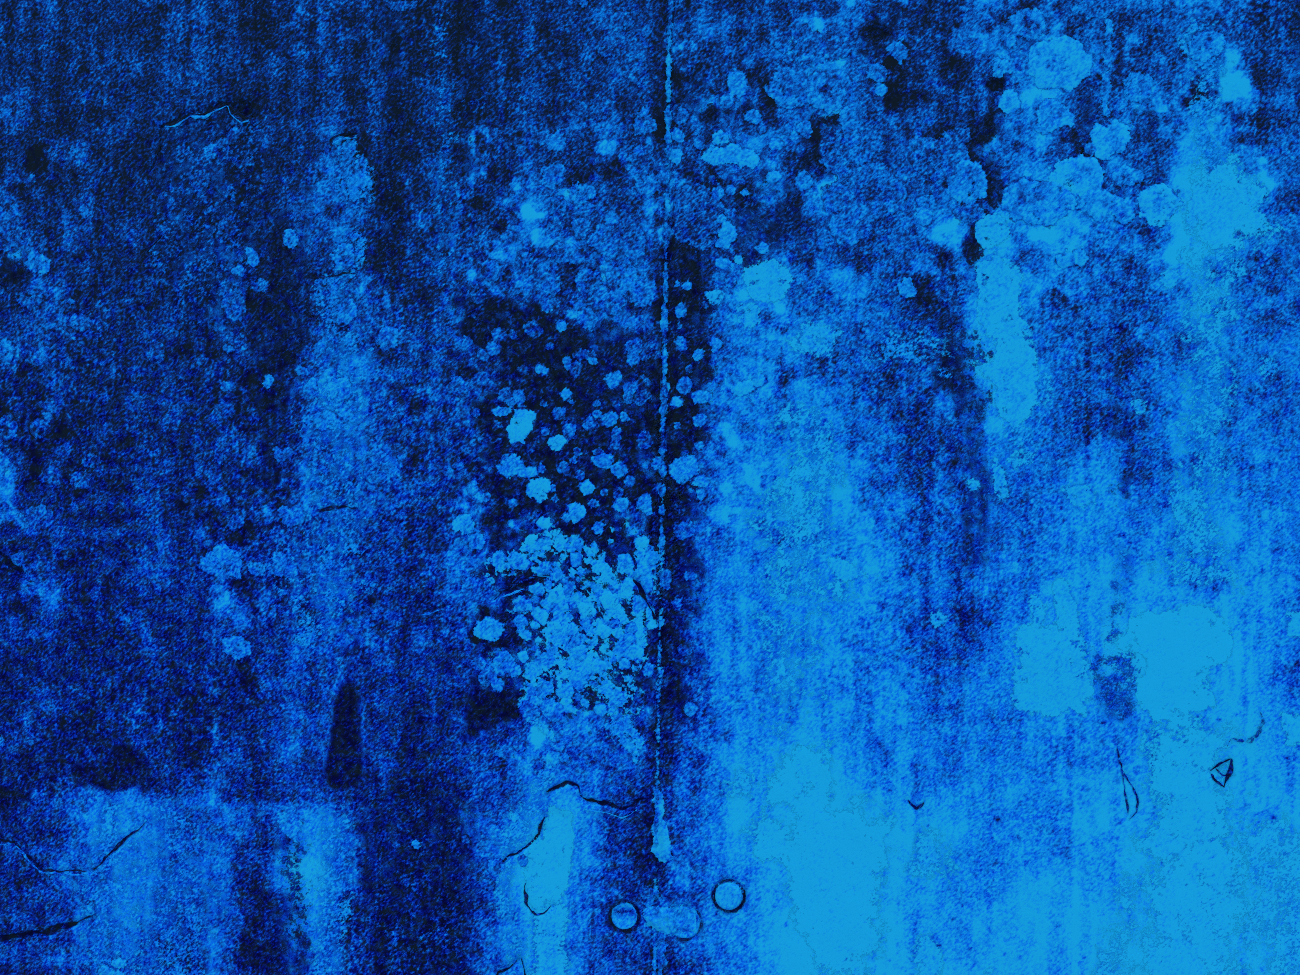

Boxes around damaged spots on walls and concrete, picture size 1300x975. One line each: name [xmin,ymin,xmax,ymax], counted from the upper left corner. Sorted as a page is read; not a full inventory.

crack [152,101,254,168]
water stain [809,113,841,128]
water stain [787,148,838,180]
water stain [0,247,31,289]
water stain [783,320,844,358]
water stain [864,73,1054,567]
water stain [427,0,803,741]
crack [0,823,145,876]
spalling [487,759,575,975]
crack [0,915,93,942]